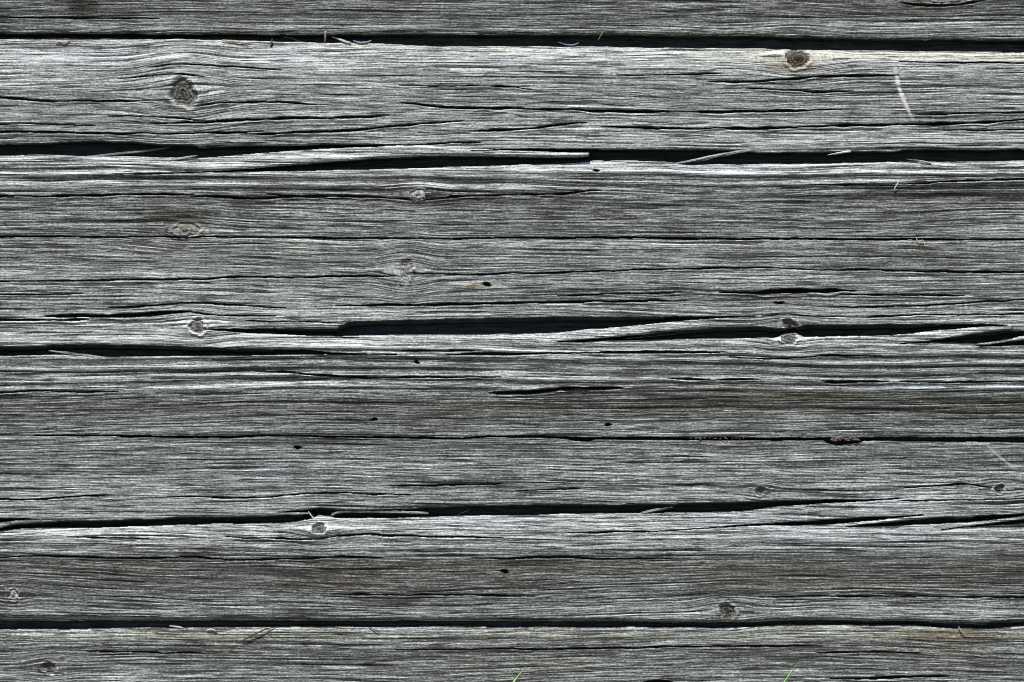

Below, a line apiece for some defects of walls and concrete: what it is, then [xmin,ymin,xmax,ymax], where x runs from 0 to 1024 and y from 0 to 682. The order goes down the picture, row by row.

crack [257,350,1024,395]